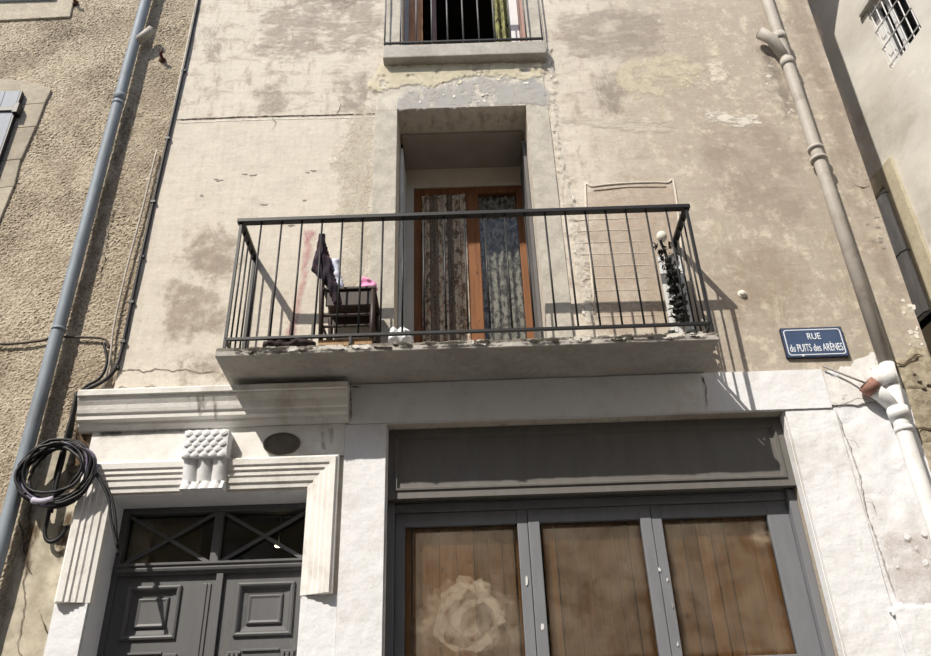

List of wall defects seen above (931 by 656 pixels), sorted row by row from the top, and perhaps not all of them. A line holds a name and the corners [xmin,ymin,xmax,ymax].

crack [175,101,375,126]
peeling [705,109,762,127]
peeling [329,62,553,286]
crack [118,368,216,389]
peeling [824,352,879,405]
spalling [893,326,931,471]